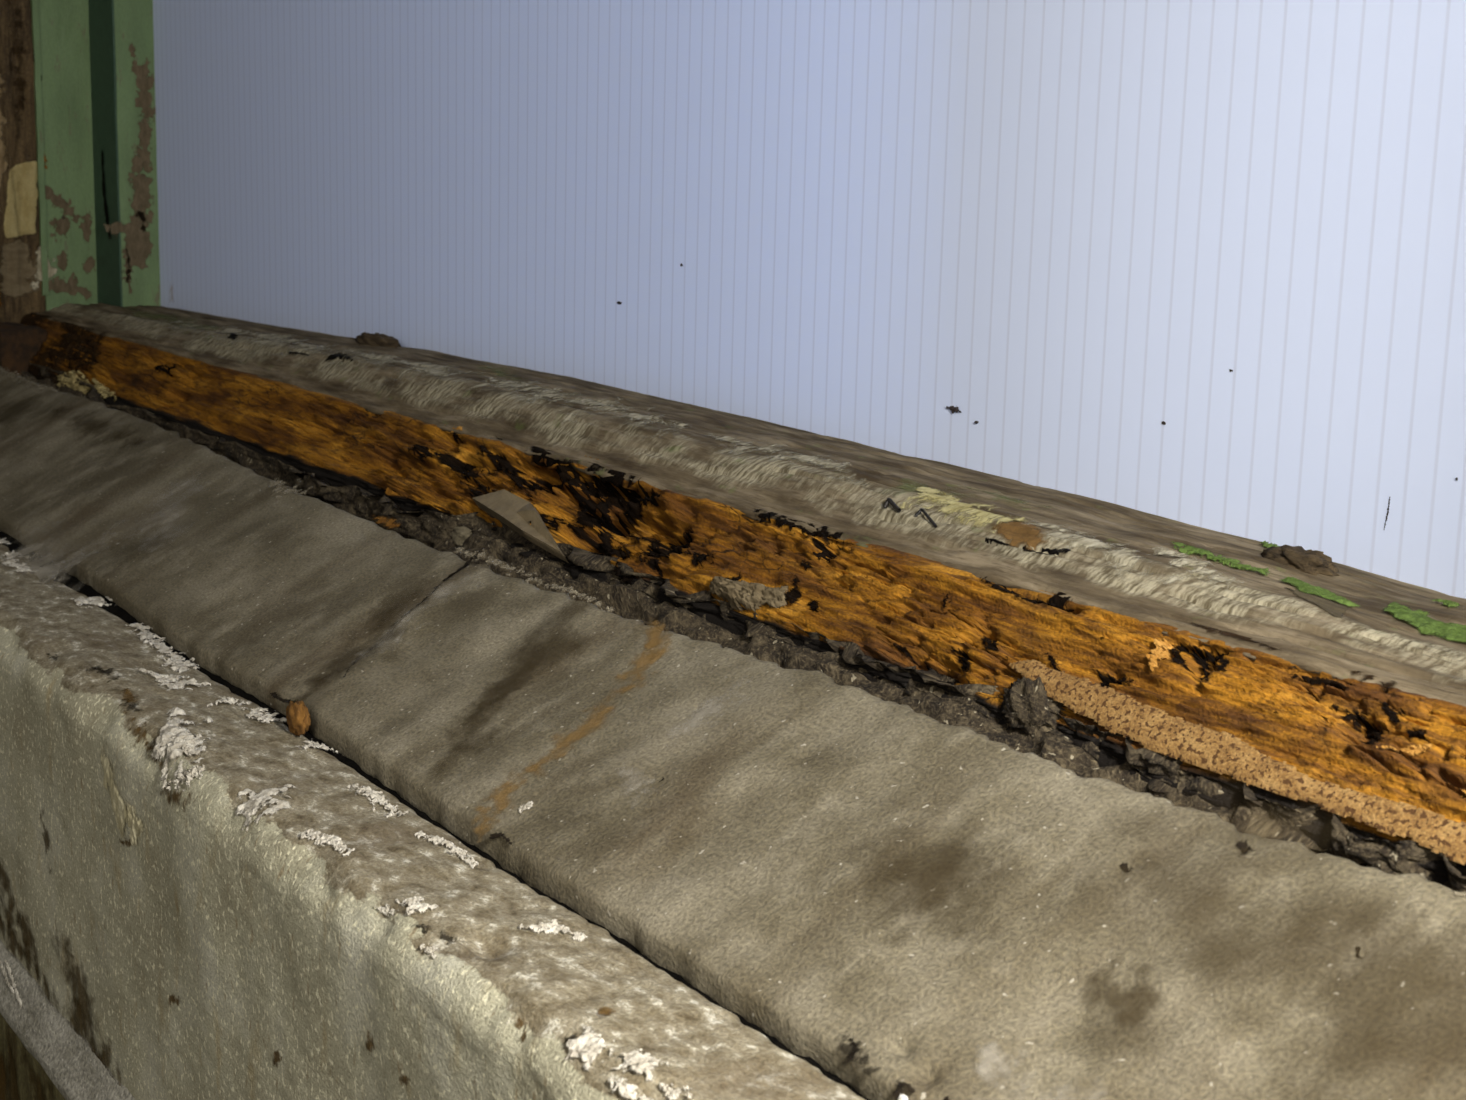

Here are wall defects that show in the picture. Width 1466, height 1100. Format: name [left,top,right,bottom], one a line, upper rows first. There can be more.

peeling [4,44,157,300]
spalling [408,432,844,612]
spalling [979,577,1077,614]
spalling [1168,642,1230,681]
spalling [1293,674,1430,744]
spalling [235,784,295,831]
spalling [347,783,408,818]
spalling [297,829,356,857]
spalling [415,831,479,869]
spalling [375,896,454,959]
spalling [519,918,588,941]
damp [0,864,121,1086]